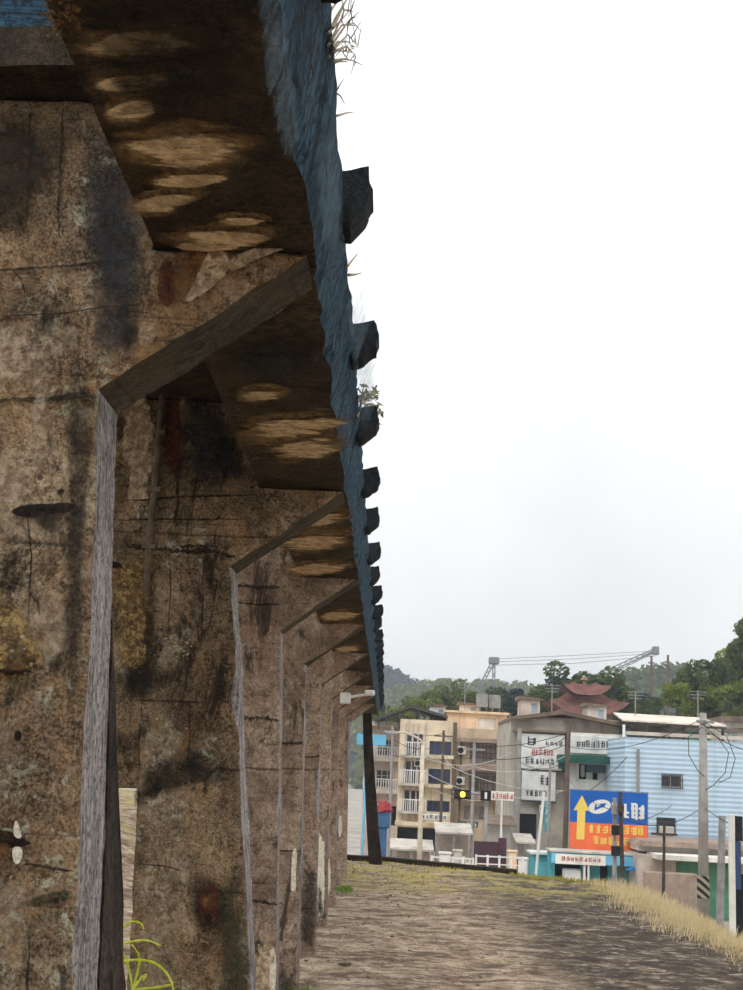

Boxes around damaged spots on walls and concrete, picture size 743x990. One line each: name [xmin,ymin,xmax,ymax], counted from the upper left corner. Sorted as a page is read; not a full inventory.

crack [0,260,153,316]
spalling [166,212,282,302]